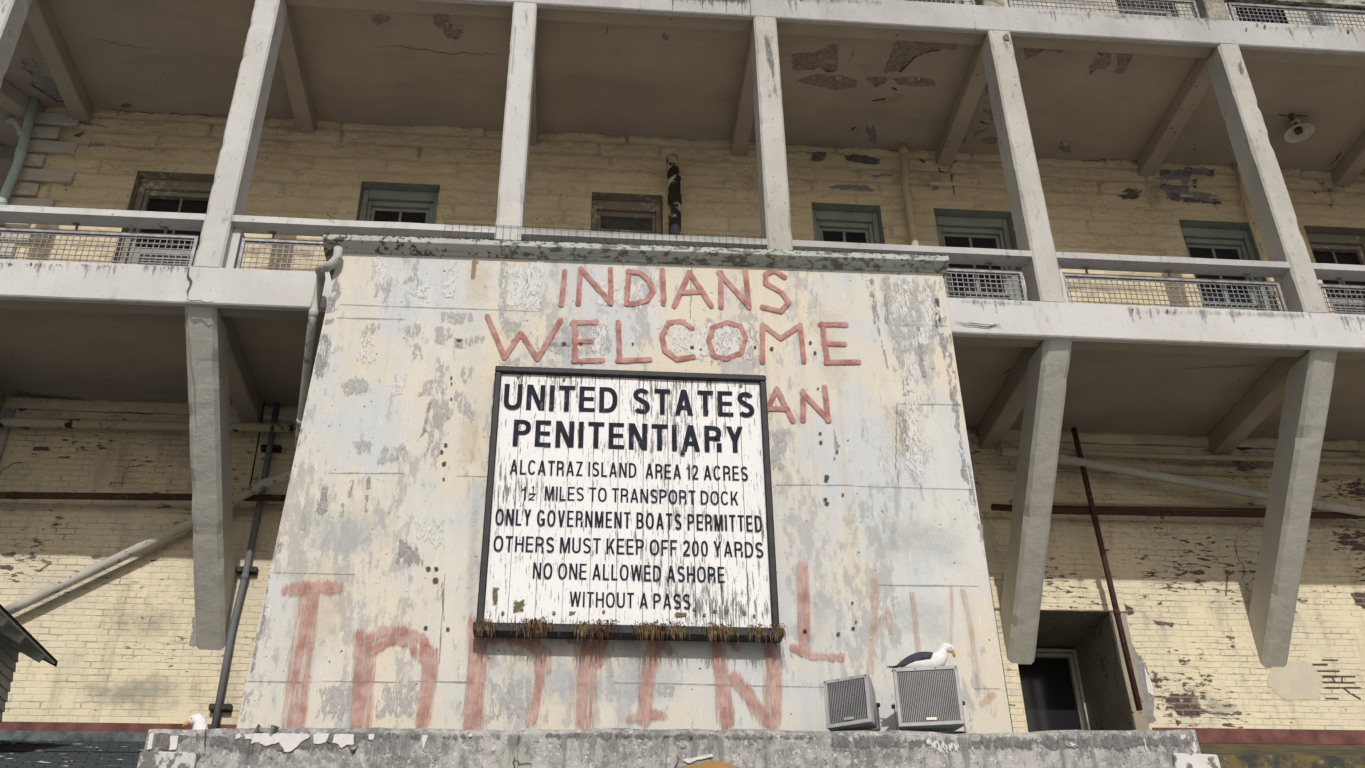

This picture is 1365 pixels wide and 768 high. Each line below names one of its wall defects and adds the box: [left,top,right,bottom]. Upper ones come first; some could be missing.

leakage [672,0,751,14]
peeling [791,40,957,90]
peeling [1118,188,1142,200]
peeling [1159,167,1222,204]
crack [187,267,214,303]
peeling [1335,478,1365,499]
peeling [1332,529,1365,608]
peeling [147,733,181,750]